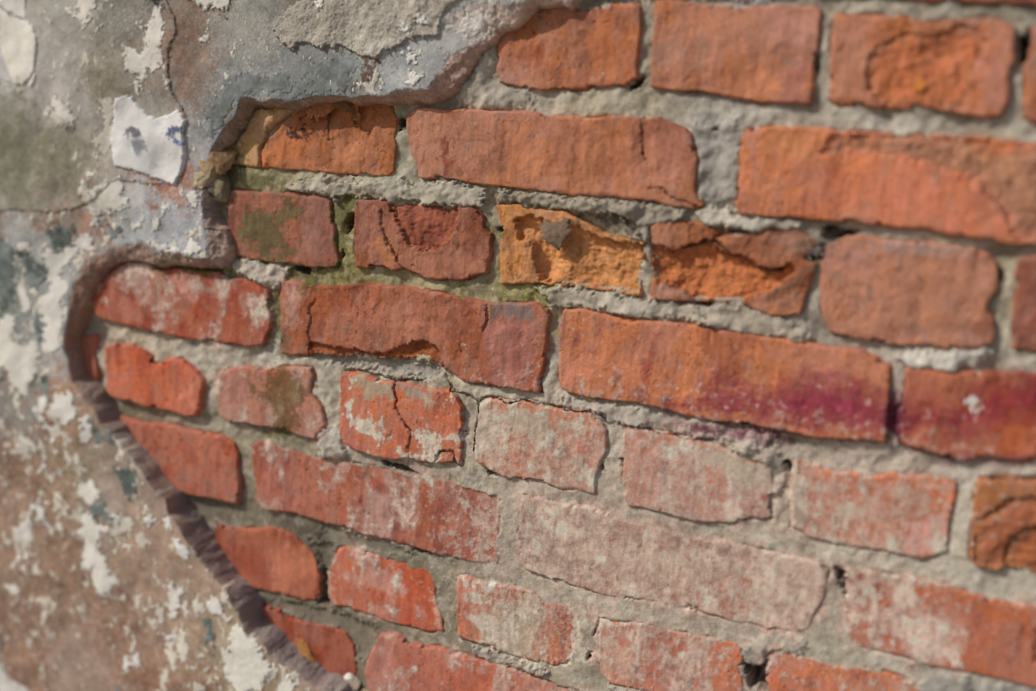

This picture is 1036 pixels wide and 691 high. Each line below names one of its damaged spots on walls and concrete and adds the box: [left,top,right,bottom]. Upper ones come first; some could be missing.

spalling [865,23,990,112]
spalling [819,131,1036,243]
water stain [111,254,237,352]
water stain [245,294,277,327]
flaking render [0,0,583,691]
spalling [515,214,796,303]
crack [661,230,785,271]
crack [349,369,954,466]
spalling [971,495,1036,573]